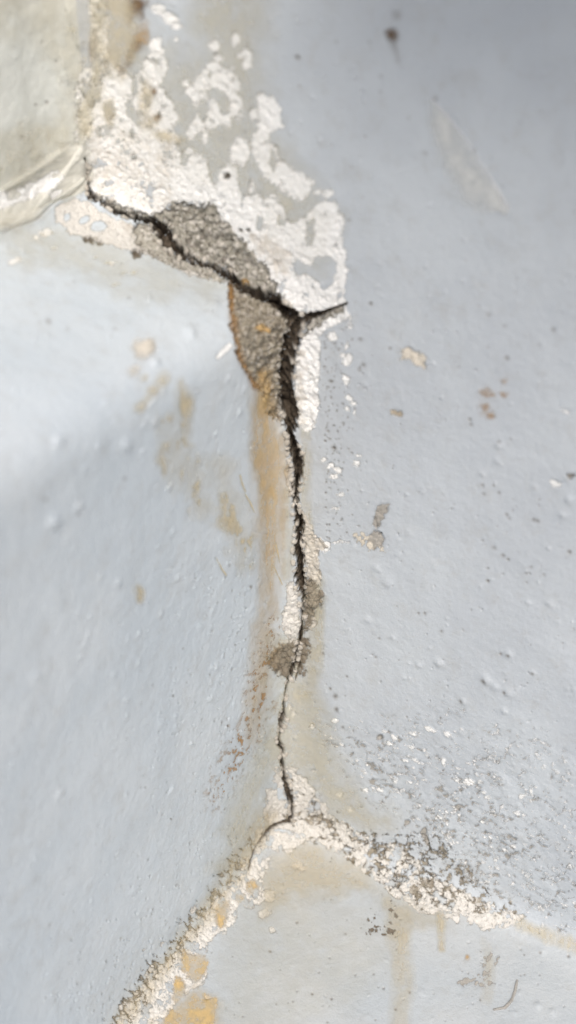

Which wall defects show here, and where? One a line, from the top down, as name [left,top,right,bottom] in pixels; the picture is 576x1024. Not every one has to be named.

peeling [0,2,357,433]
crack [85,161,347,871]
peeling [321,454,361,479]
peeling [112,710,576,1024]